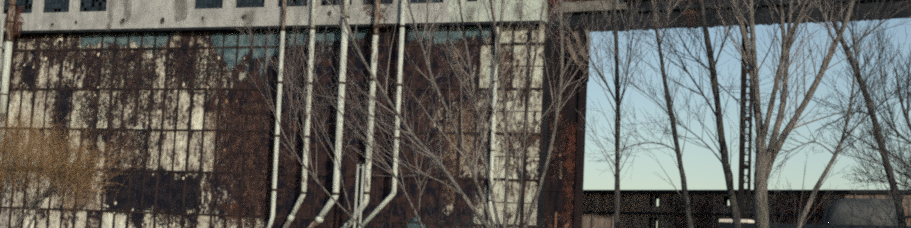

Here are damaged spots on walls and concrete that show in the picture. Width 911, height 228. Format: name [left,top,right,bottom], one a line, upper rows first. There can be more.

damp [80,31,173,53]
rust [204,91,303,228]
rust [495,79,646,228]